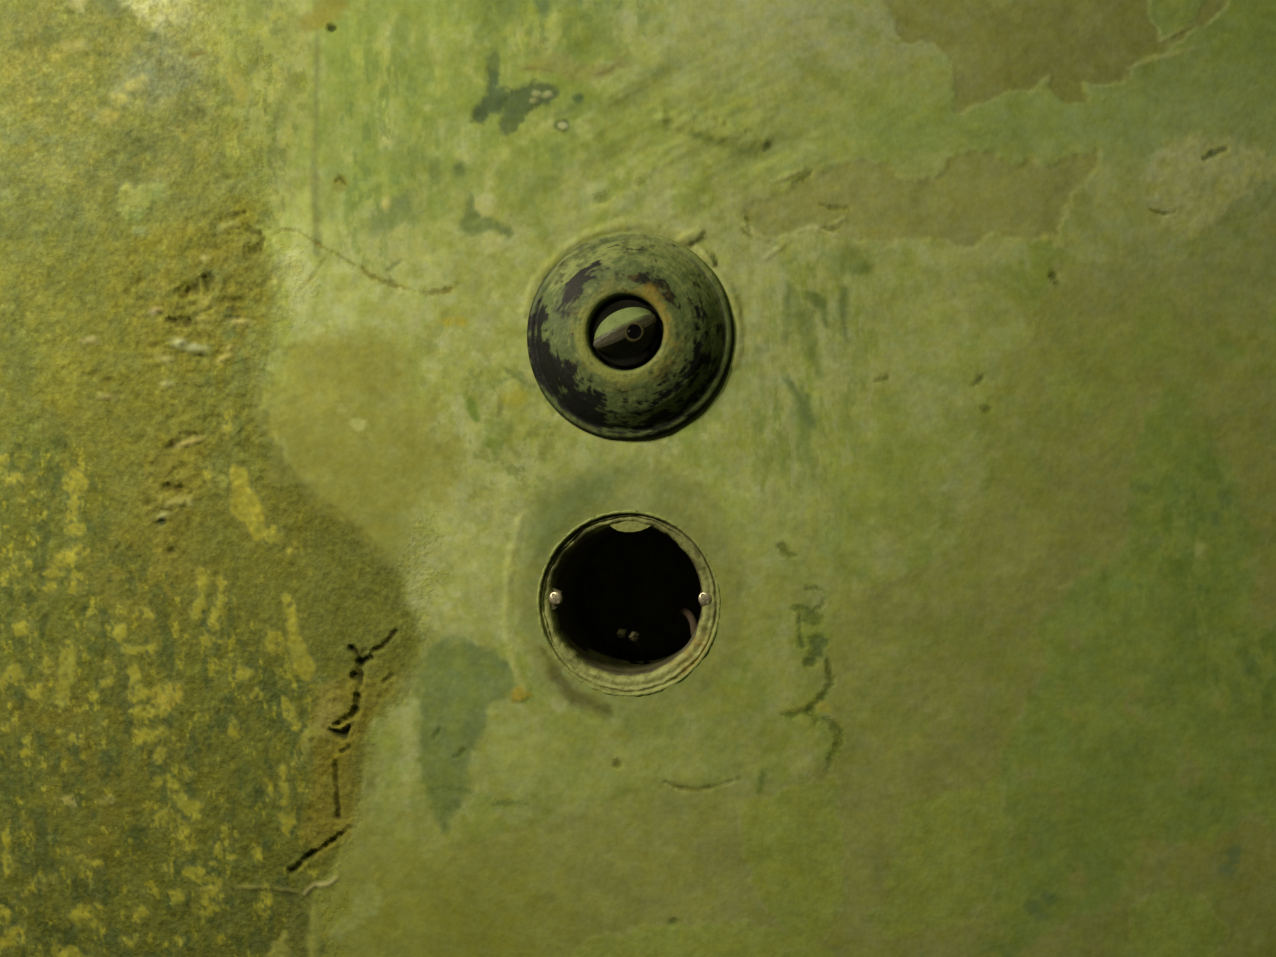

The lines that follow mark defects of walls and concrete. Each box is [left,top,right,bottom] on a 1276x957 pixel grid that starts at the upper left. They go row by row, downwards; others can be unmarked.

water stain [274,21,344,260]
peeling [881,0,1232,116]
crack [195,627,399,898]
crack [777,583,848,777]